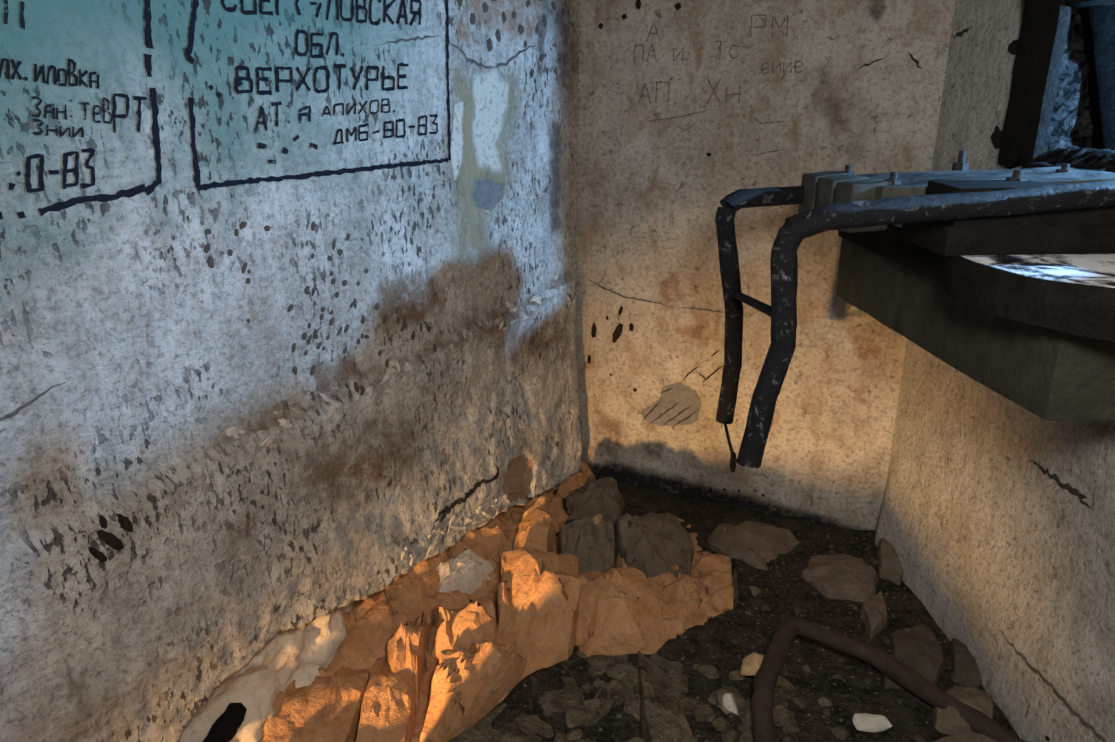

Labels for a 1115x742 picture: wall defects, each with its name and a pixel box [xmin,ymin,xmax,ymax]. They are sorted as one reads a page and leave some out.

crack [0,382,66,433]
crack [1029,459,1095,511]
crack [998,630,1106,742]